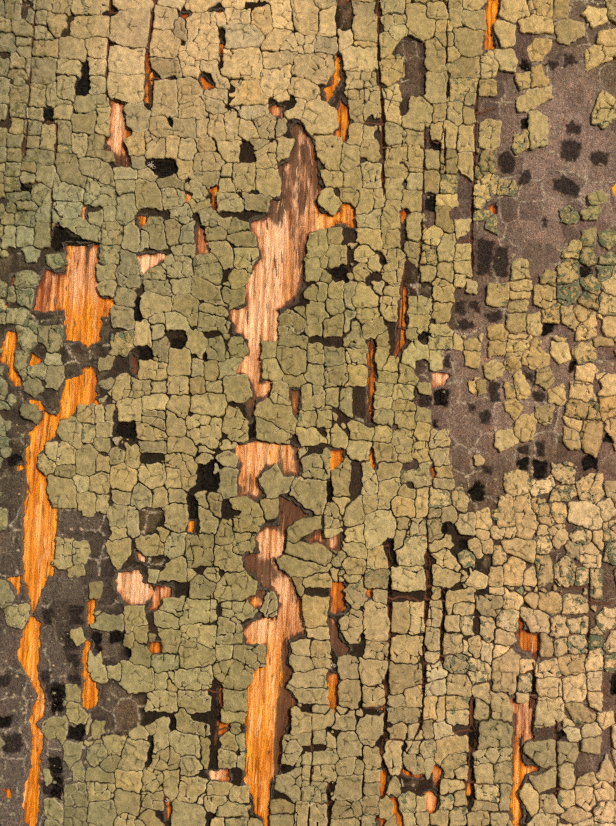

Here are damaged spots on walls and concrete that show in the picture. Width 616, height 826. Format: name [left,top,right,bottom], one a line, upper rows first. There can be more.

crack [8,3,60,240]
crack [100,0,171,108]
crack [364,0,496,423]
peeling [457,0,616,374]
peeling [431,288,616,540]
peeling [82,569,217,826]
peeling [217,688,248,771]
peeling [204,781,263,826]
crack [289,516,490,826]
peeling [490,696,616,826]
crack [535,718,575,826]
crack [566,567,611,699]